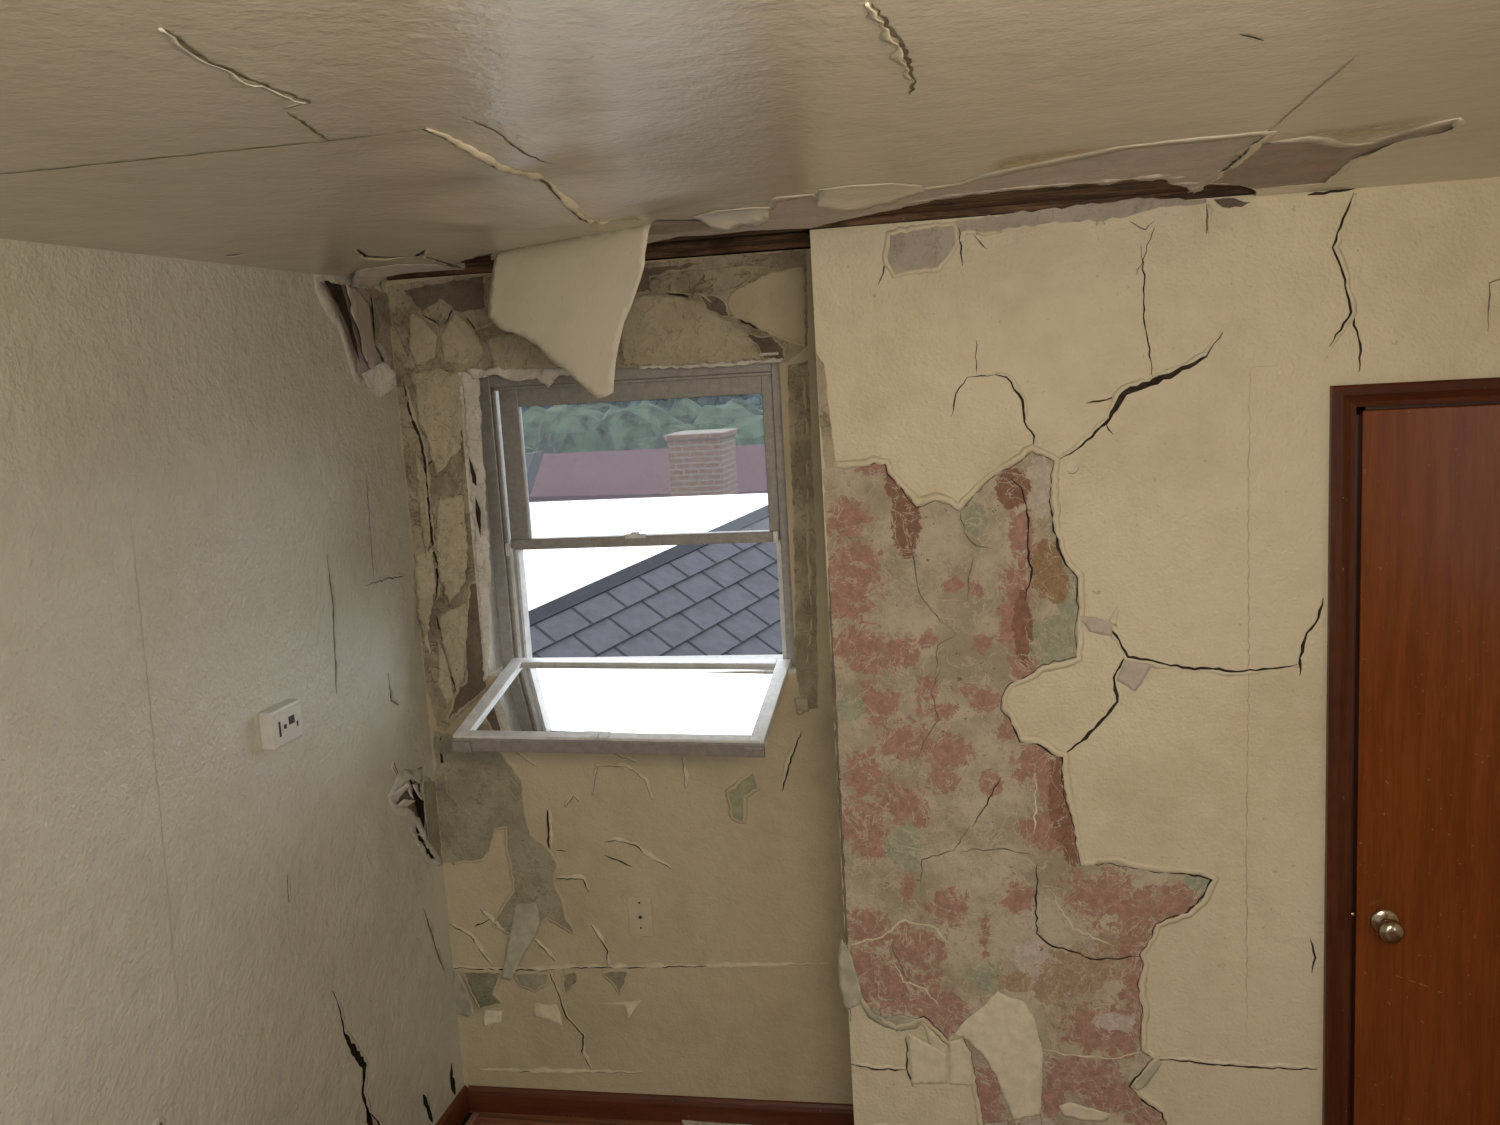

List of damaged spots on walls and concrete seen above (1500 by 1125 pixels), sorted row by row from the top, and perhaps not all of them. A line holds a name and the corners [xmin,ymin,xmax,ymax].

crack [4,28,642,226]
crack [865,3,916,95]
crack [1200,58,1354,234]
crack [952,221,1223,459]
crack [1308,188,1362,371]
crack [1488,279,1500,328]
peeling [313,117,1468,1125]
crack [1067,365,1324,1070]
crack [410,827,443,866]
crack [423,752,830,1123]
crack [332,989,387,1125]